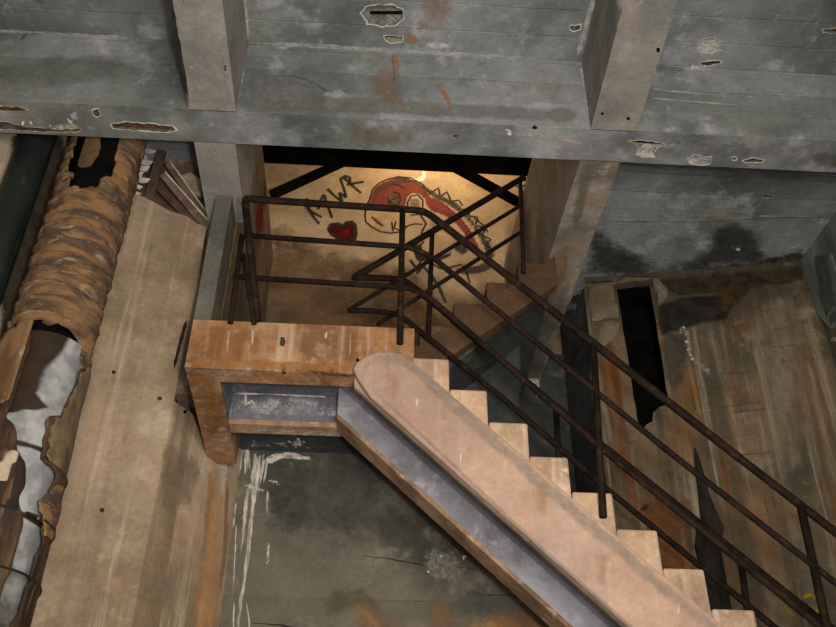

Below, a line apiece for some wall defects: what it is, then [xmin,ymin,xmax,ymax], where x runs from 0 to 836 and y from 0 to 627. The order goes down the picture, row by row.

spalling [360,3,405,44]
spalling [0,105,82,133]
spalling [110,121,178,133]
spalling [627,140,665,158]
spalling [687,154,712,166]
damp [672,225,760,270]
damp [233,430,384,627]
crack [367,556,477,570]
crack [246,619,292,627]